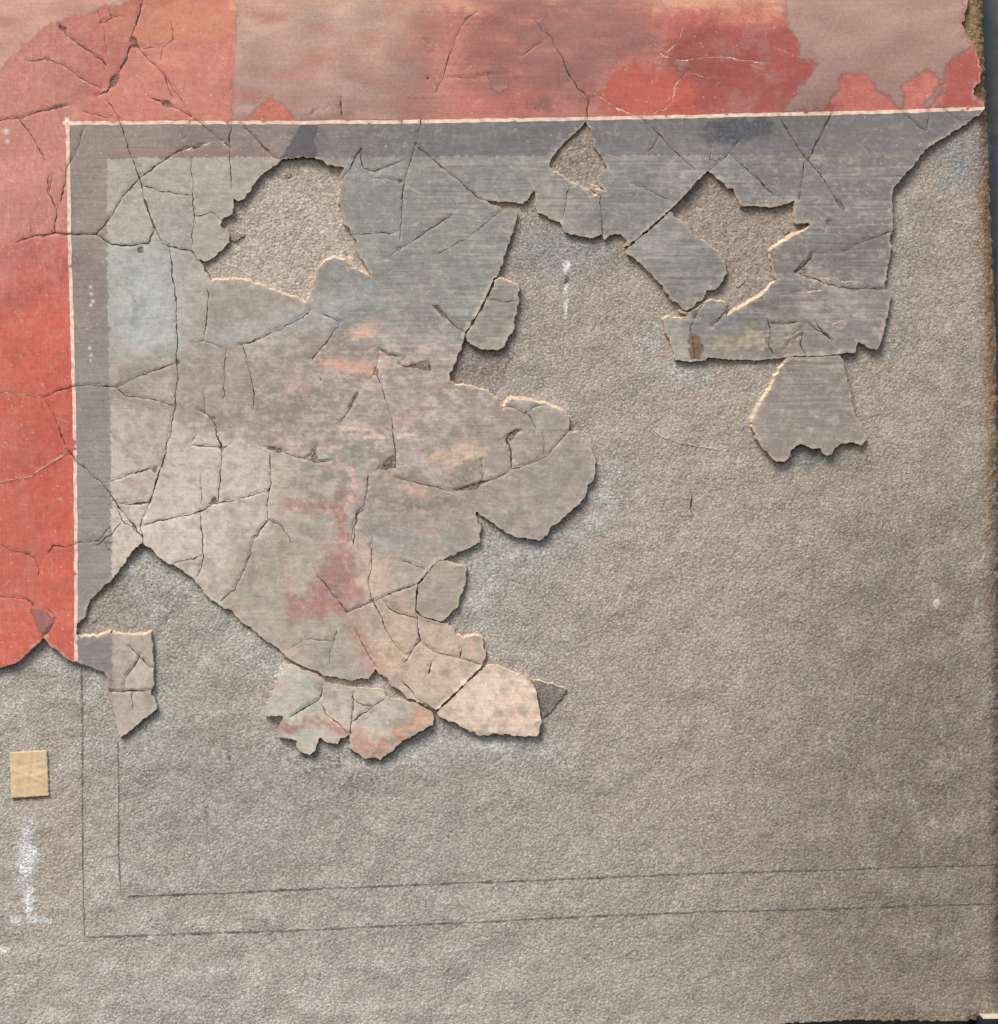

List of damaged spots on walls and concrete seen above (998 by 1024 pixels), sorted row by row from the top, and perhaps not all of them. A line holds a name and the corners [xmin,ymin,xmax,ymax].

crack [0,3,340,600]
spalling [201,156,369,301]
crack [342,118,500,259]
spalling [450,331,515,396]
spalling [550,123,606,195]
crack [524,22,773,194]
spalling [670,172,808,314]
spalling [76,544,203,635]
crack [292,349,567,708]
crack [110,648,149,707]
crack [292,689,382,734]
leakage [10,818,53,926]